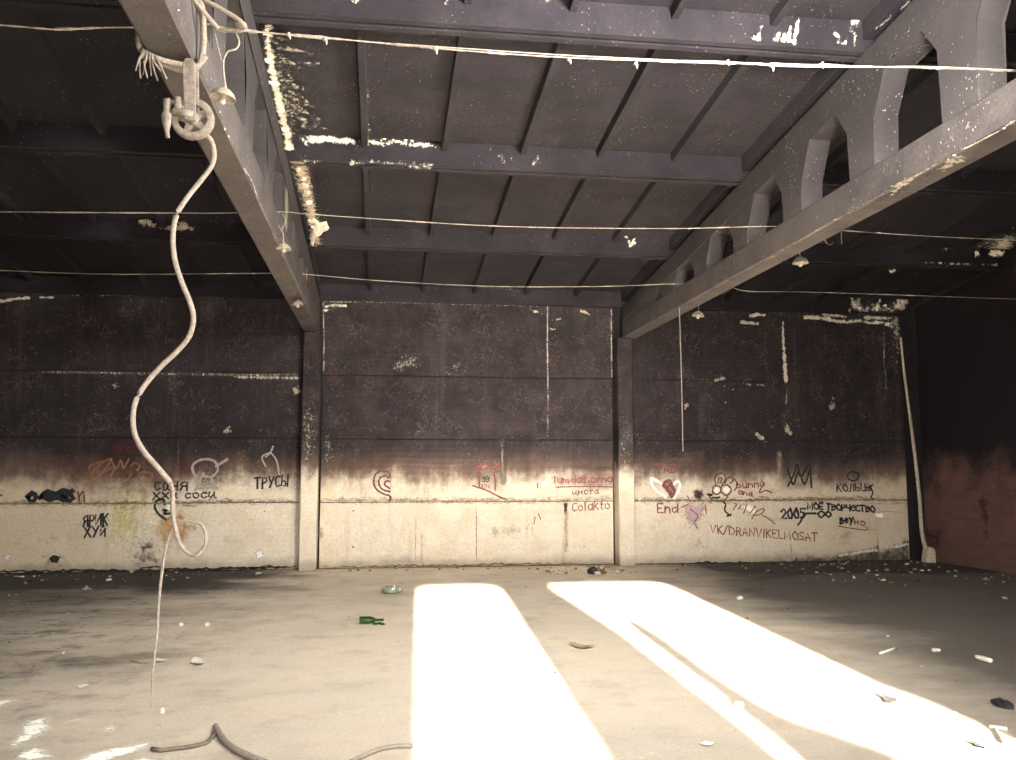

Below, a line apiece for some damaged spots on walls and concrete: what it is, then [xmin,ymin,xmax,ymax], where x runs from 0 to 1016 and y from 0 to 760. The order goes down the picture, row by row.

water stain [263,25,356,151]
water stain [368,124,436,148]
peeling [862,120,1016,205]
flaking render [803,313,893,327]